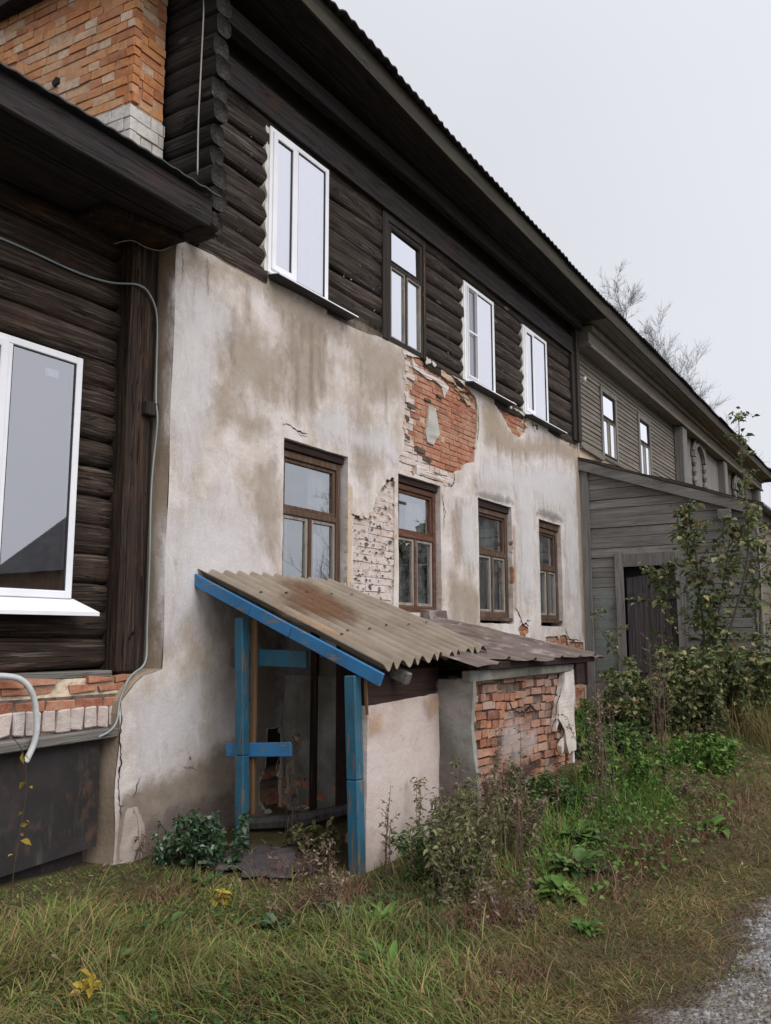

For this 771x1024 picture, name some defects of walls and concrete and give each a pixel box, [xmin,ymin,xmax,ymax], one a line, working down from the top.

spalling [342,350,478,605]
spalling [498,406,538,437]
crack [118,711,142,838]